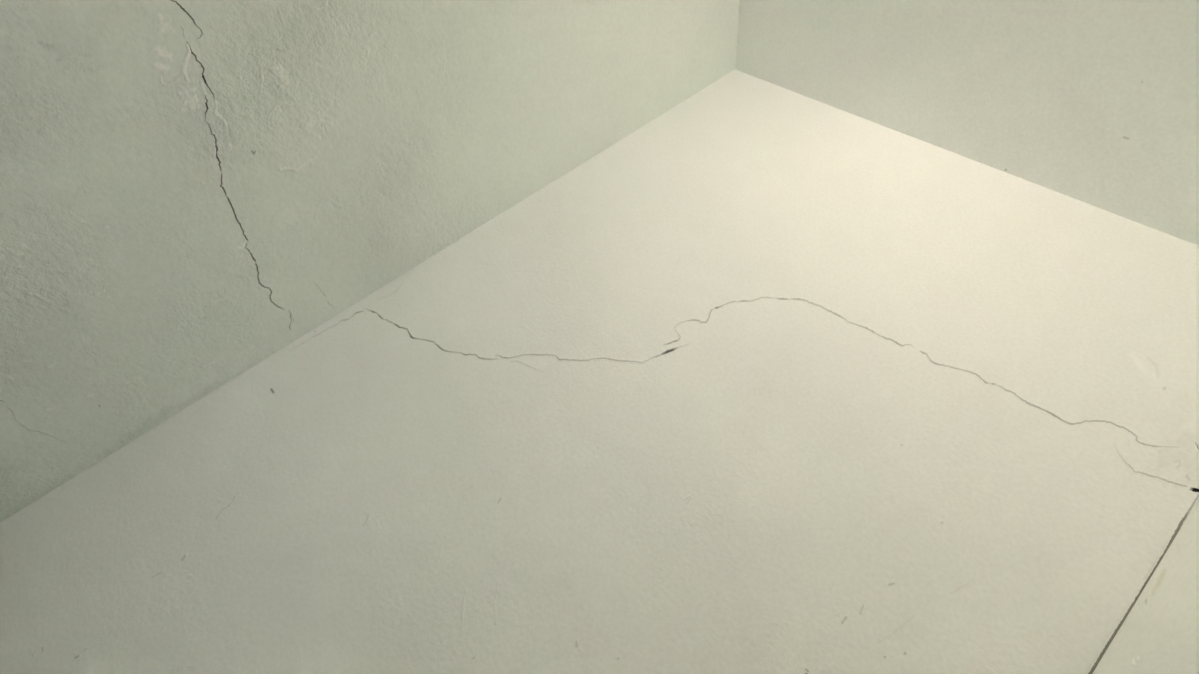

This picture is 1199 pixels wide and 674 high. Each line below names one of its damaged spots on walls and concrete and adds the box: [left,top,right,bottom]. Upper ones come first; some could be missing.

crack [166,0,296,331]
crack [310,295,1199,674]